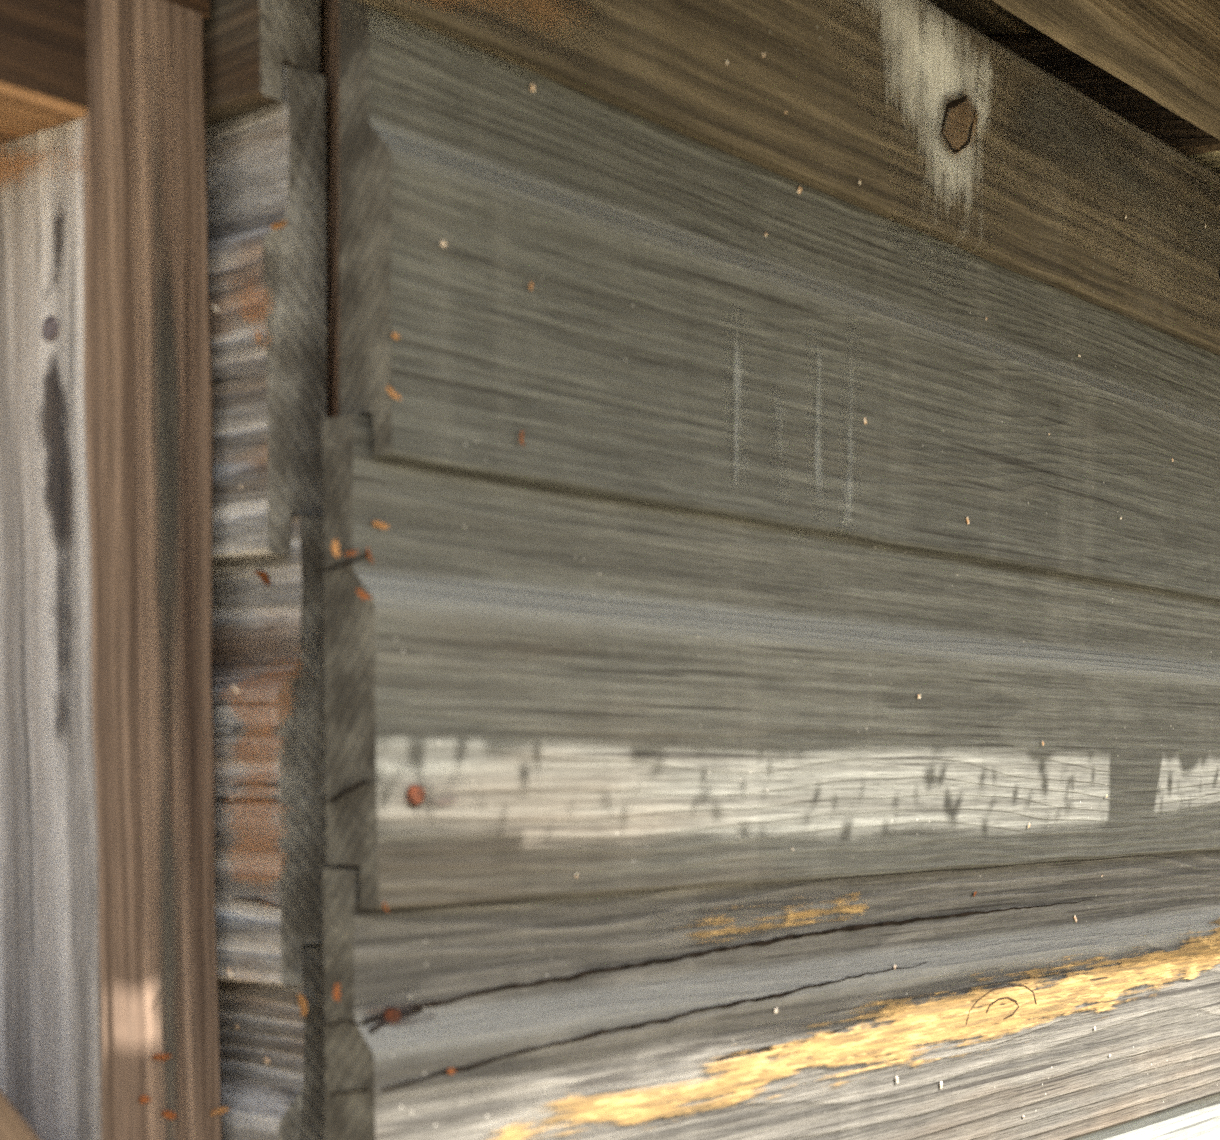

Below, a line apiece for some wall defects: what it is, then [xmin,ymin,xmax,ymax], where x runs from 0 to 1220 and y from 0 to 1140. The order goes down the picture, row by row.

leakage [54,195,62,279]
leakage [39,357,71,735]
crack [328,962,927,1096]
crack [326,899,1089,1034]
peeling [494,919,1220,1140]